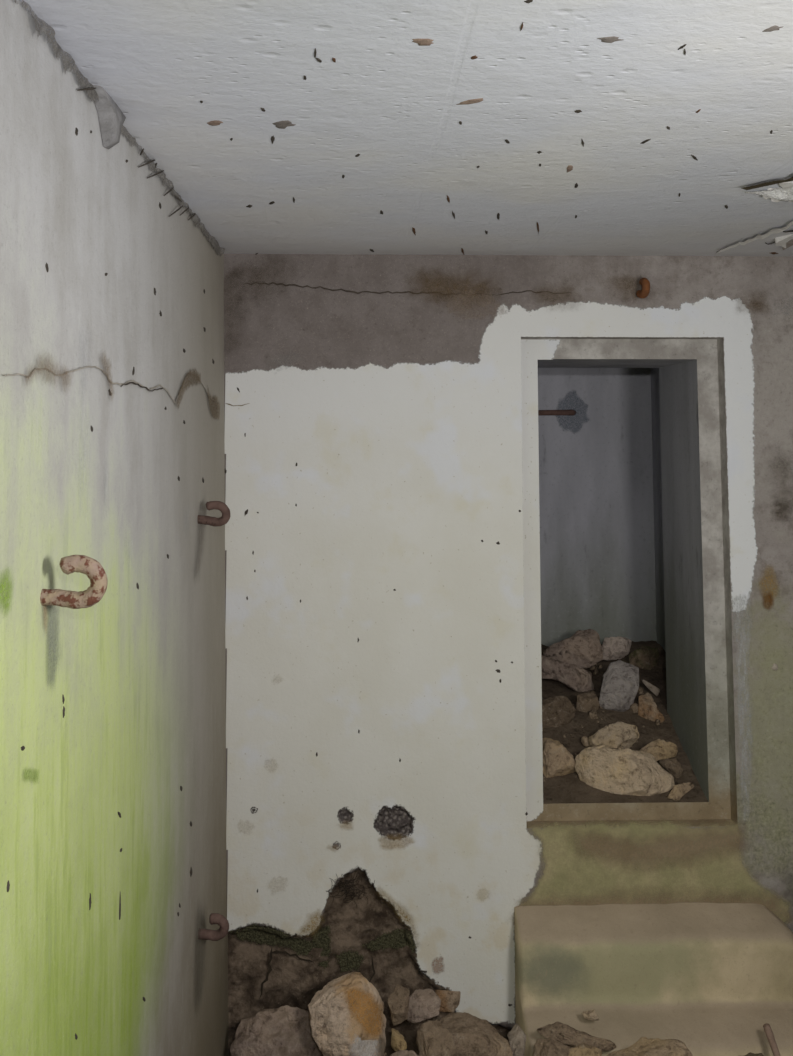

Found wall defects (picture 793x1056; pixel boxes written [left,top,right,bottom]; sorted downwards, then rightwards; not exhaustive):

crack [245,282,570,296]
crack [3,366,249,406]
spalling [338,807,353,824]
spalling [373,806,416,847]
spalling [228,868,455,1056]